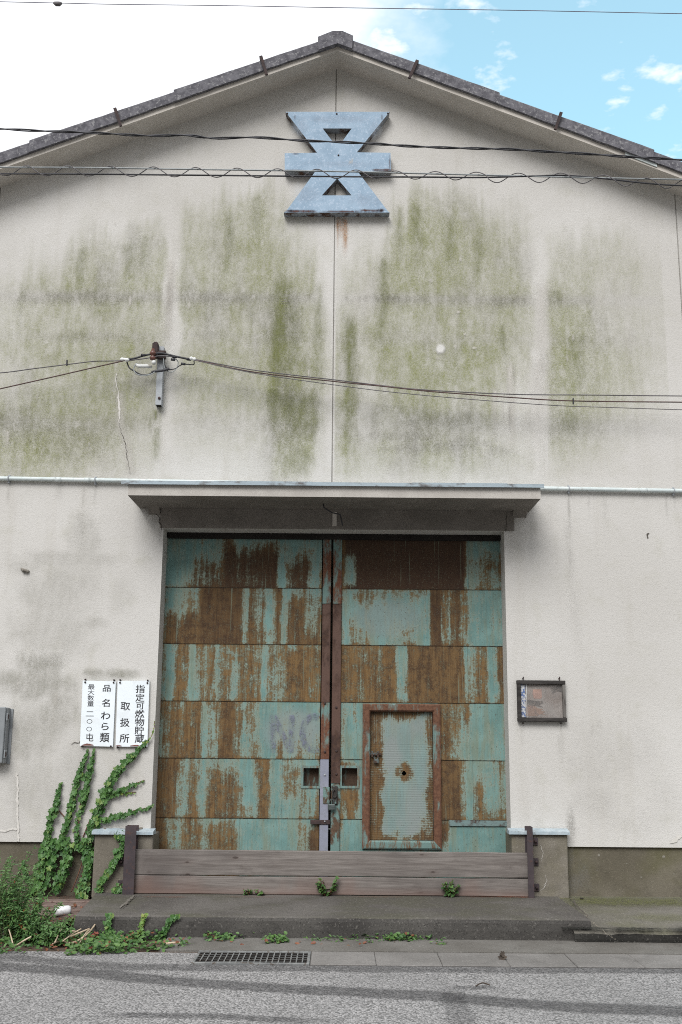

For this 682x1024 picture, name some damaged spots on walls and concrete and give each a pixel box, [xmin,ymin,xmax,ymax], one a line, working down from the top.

crack [115,374,130,470]